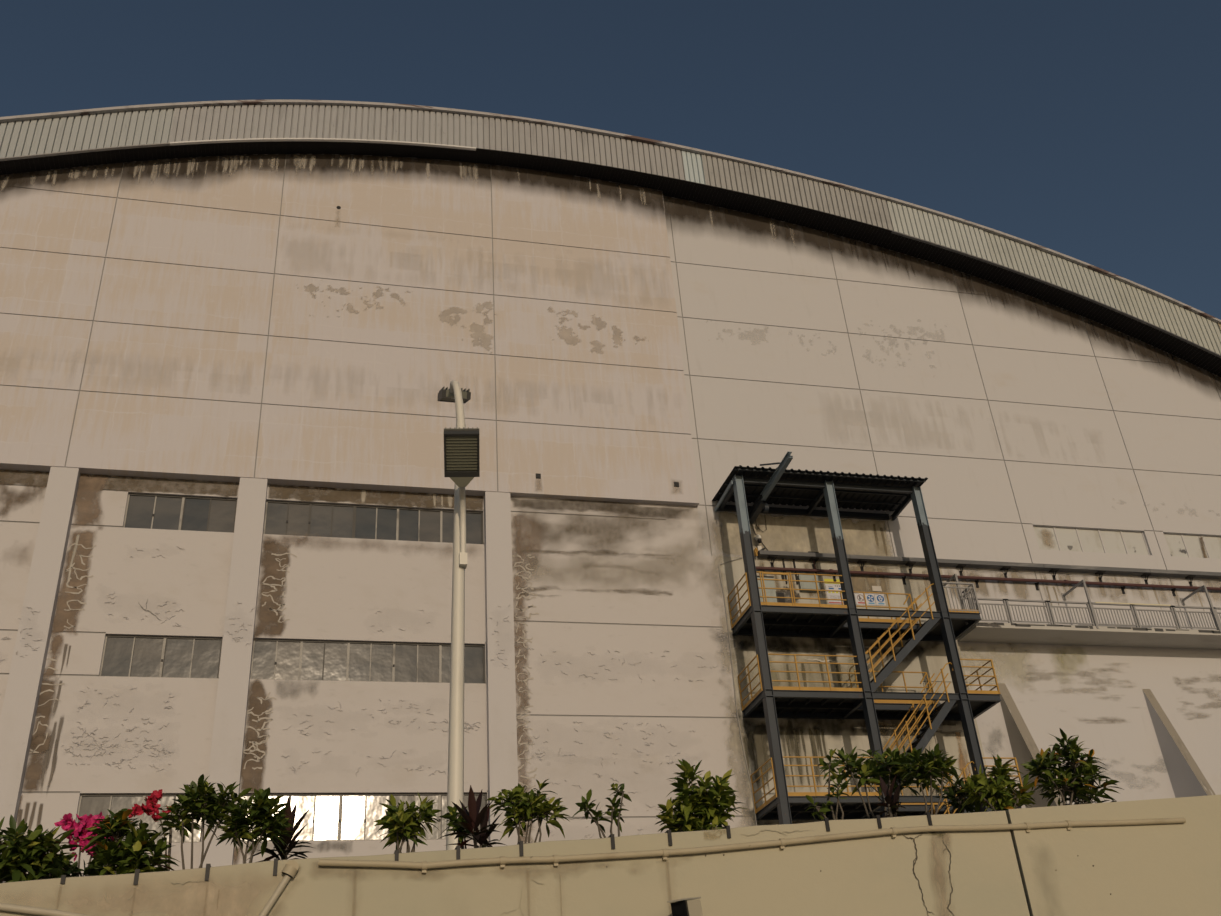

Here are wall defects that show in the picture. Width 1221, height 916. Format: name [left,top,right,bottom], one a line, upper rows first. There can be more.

water stain [0,154,1221,392]
crack [29,543,97,753]
crack [243,692,276,770]
crack [261,553,297,623]
water stain [512,498,679,793]
crack [902,834,954,916]